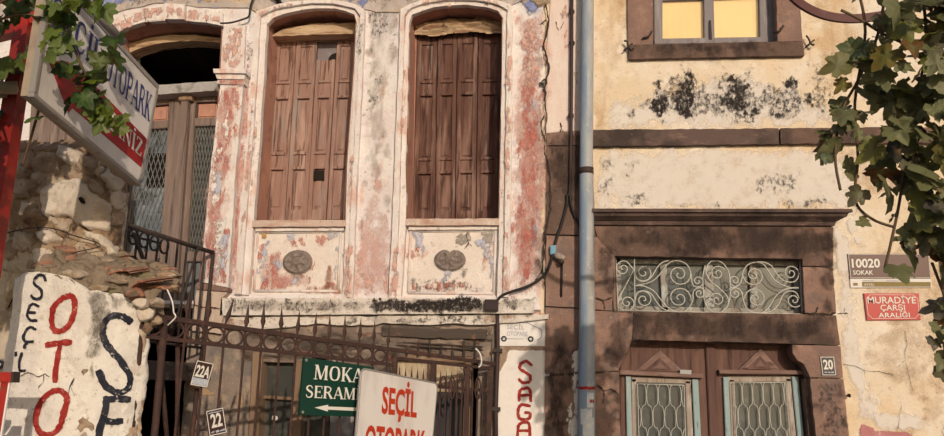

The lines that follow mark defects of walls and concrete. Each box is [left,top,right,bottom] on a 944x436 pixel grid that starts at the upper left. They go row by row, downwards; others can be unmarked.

peeling [113,0,242,67]
damp [628,62,832,123]
peeling [203,80,257,283]
peeling [455,0,551,315]
crack [535,4,564,287]
damp [228,298,358,312]
peeling [252,201,425,296]
damp [371,268,482,324]
peeling [412,271,465,291]
crack [843,332,913,430]